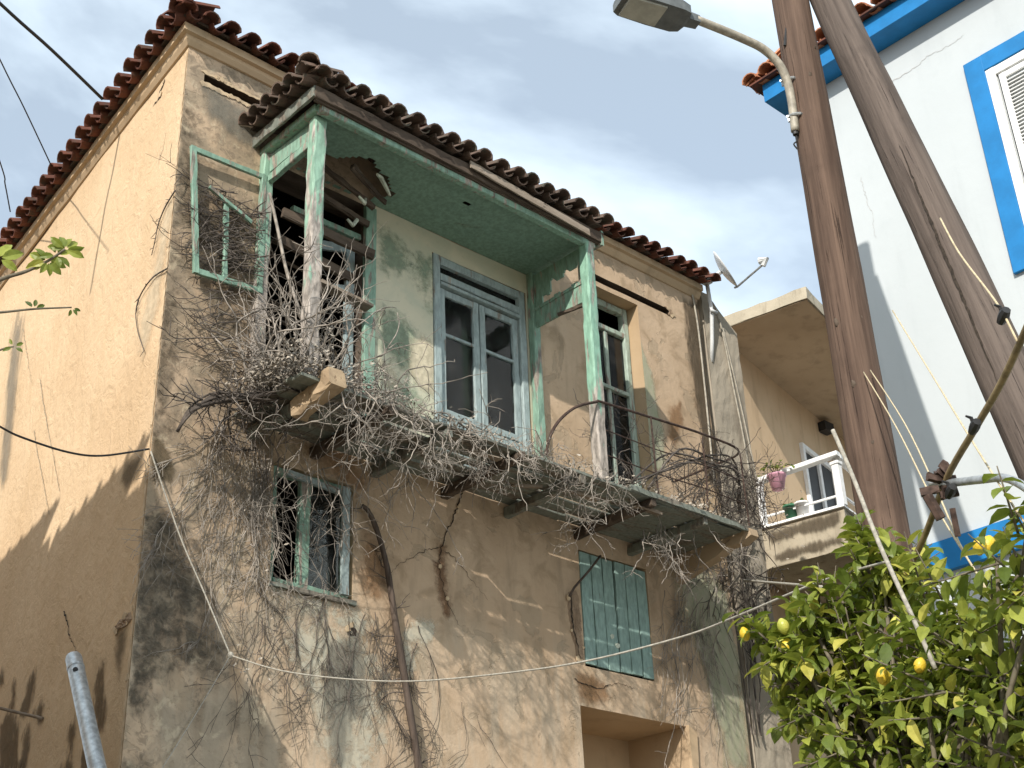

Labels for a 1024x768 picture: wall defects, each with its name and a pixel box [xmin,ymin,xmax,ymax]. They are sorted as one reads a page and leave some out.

leakage [117,515,226,705]
crack [391,492,487,626]